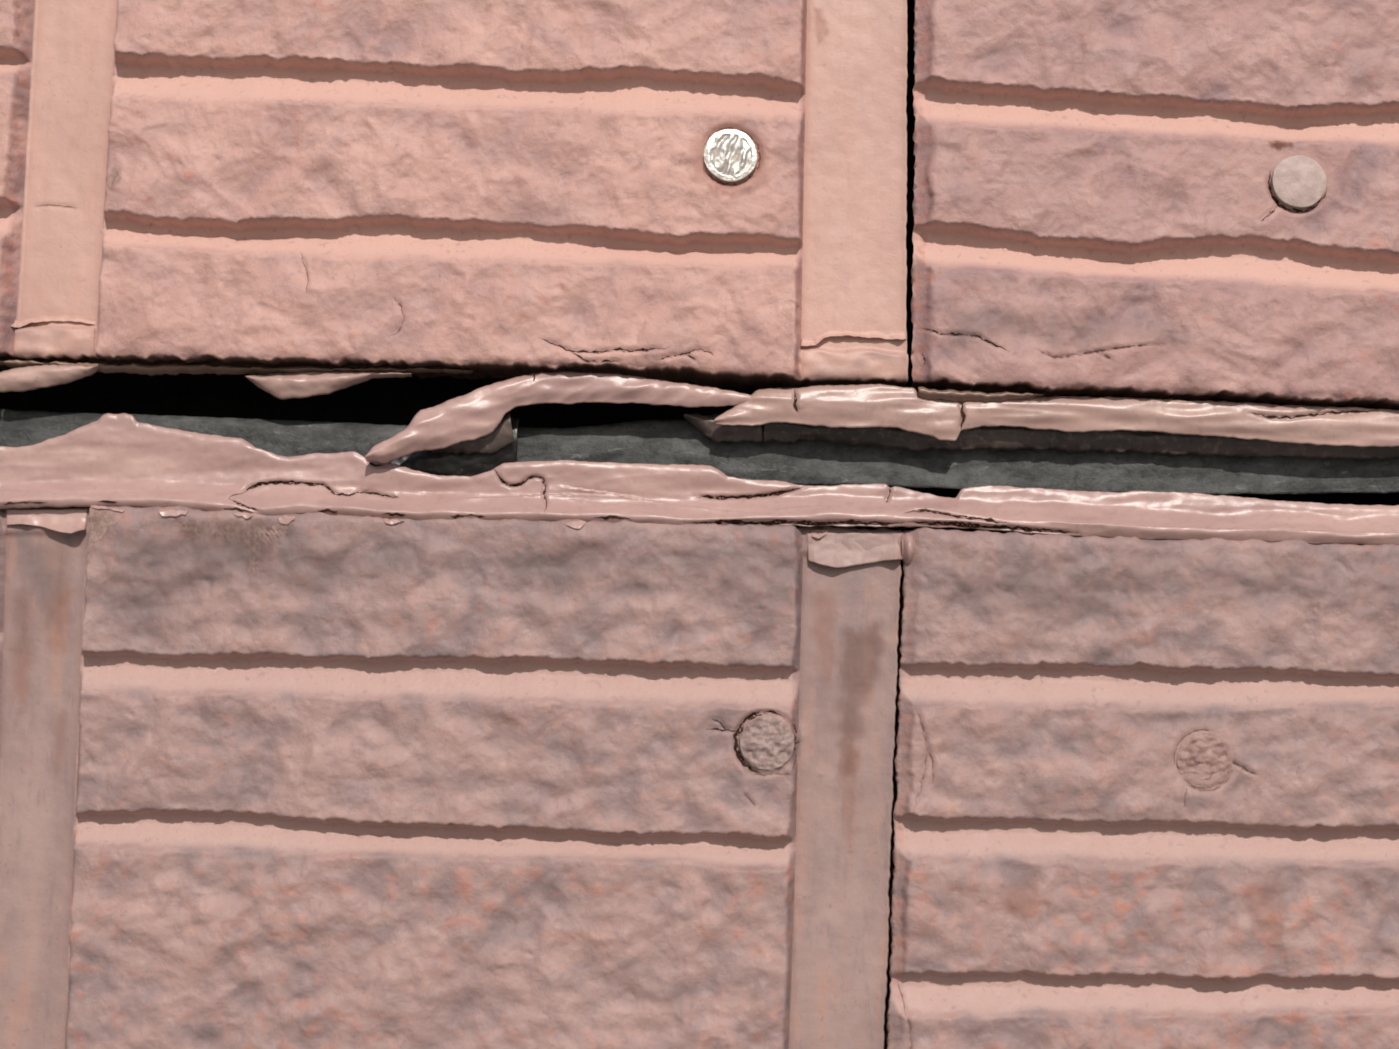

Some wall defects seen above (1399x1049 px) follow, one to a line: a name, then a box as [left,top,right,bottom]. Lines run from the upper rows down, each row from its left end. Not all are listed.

peeling [158,509,188,517]
peeling [6,505,125,533]
peeling [278,515,296,525]
peeling [565,520,586,529]
crack [898,984,913,1049]